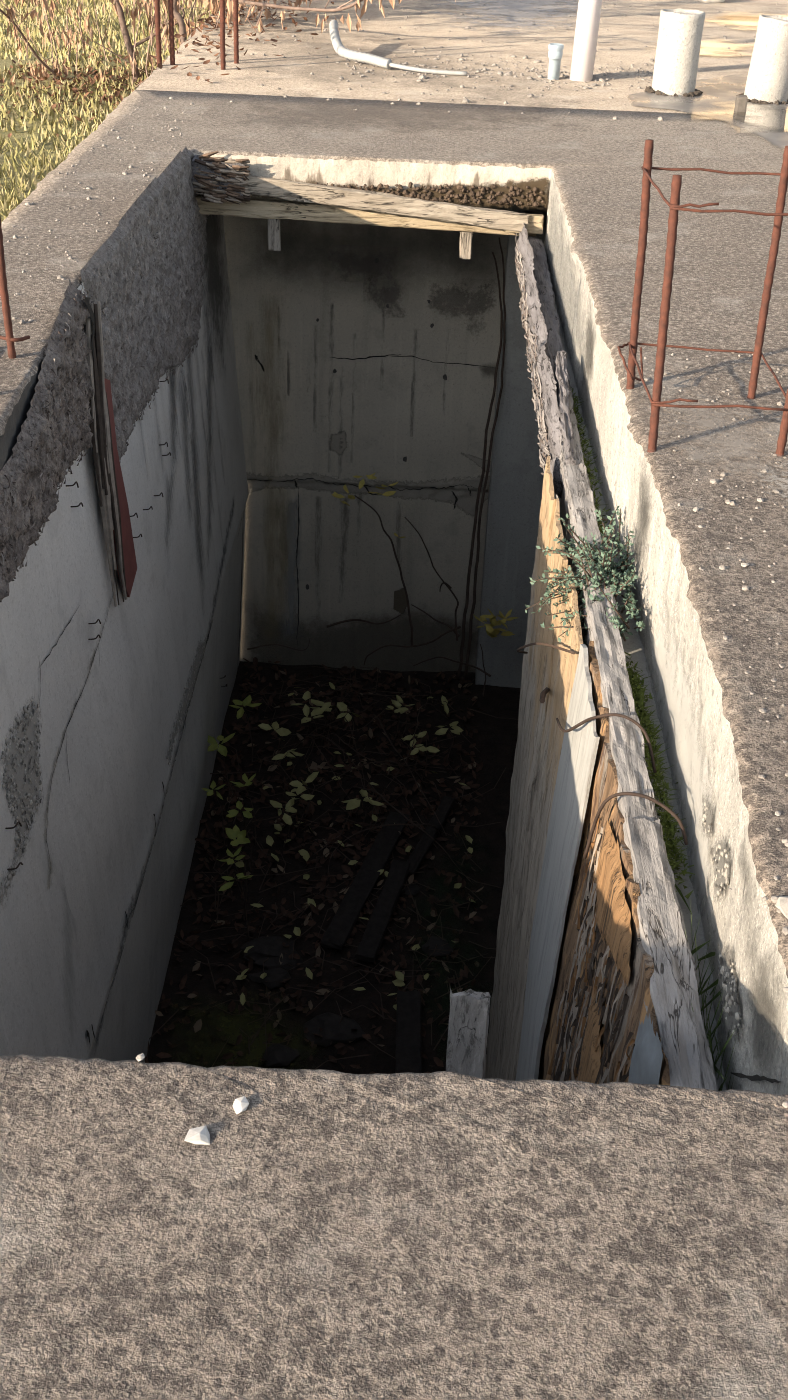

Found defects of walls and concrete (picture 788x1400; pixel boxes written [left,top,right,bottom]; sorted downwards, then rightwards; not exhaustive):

peeling [0,147,210,602]
crack [332,354,494,368]
spalling [0,700,42,903]
crack [38,603,111,888]
crack [86,692,193,1050]
crack [206,472,490,670]
water stain [255,615,478,673]